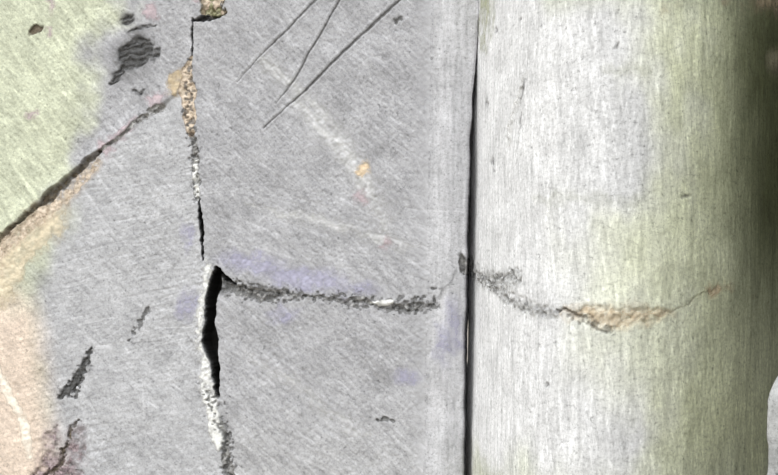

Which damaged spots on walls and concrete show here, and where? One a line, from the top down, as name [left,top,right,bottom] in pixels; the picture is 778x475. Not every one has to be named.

spalling [195,0,227,22]
spalling [110,15,160,85]
crack [0,19,439,475]
crack [471,267,580,316]
spalling [58,347,93,399]